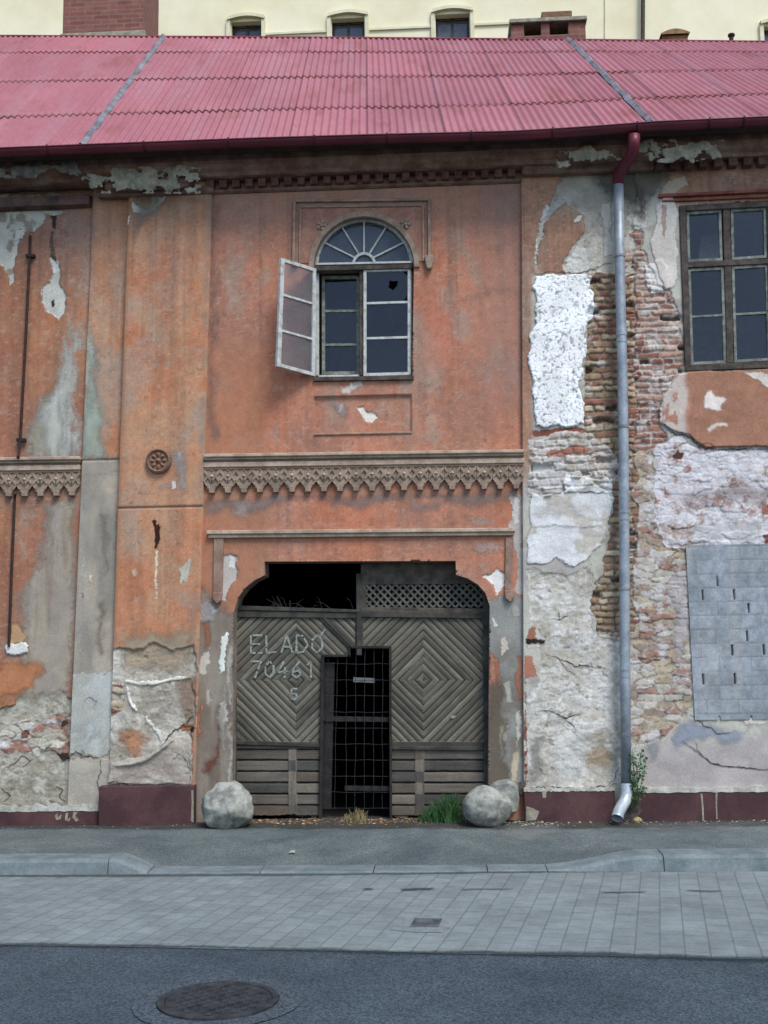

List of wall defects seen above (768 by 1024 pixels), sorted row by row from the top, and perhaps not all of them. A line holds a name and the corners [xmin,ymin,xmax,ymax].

flaking render [639,139,735,163]
flaking render [0,159,201,226]
flaking render [0,210,67,319]
flaking render [334,381,377,423]
flaking render [474,145,768,798]
corrosion [152,519,160,599]
flaking render [200,554,238,623]
flaking render [0,662,94,822]
flaking render [109,632,228,823]
crack [161,716,199,747]
crack [684,714,766,770]